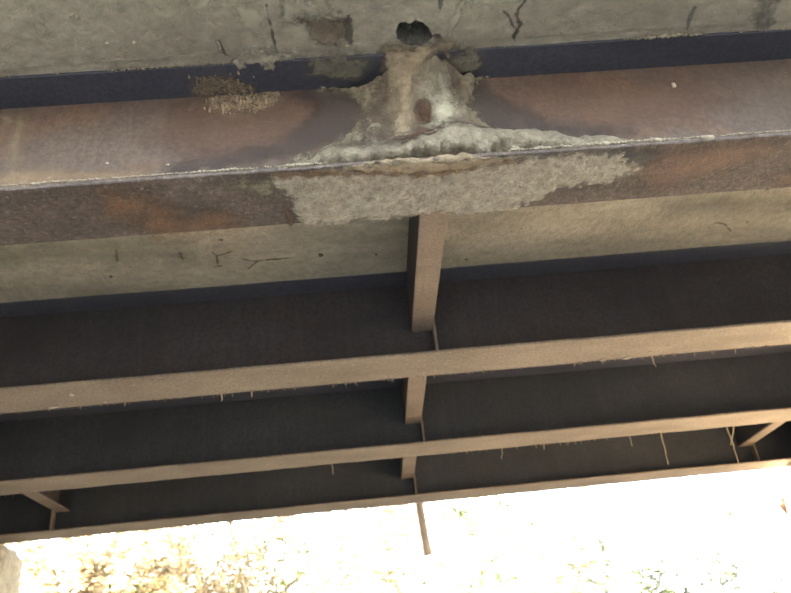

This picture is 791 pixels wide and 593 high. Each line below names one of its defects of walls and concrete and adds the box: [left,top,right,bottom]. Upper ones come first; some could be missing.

crack [503,0,526,39]
spalling [396,20,442,45]
spalling [412,99,431,124]
rust [645,141,773,186]
rust [0,172,139,187]